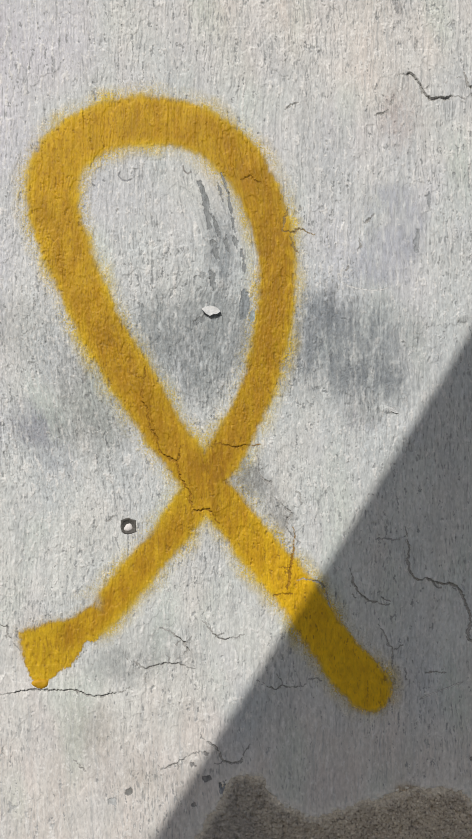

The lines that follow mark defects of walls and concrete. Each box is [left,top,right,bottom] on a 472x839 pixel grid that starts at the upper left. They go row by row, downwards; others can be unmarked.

crack [399,60,472,101]
crack [130,366,220,524]
crack [378,527,472,642]
crack [0,621,240,698]
crack [350,569,446,680]
crack [161,734,249,770]
flaking render [194,771,472,839]